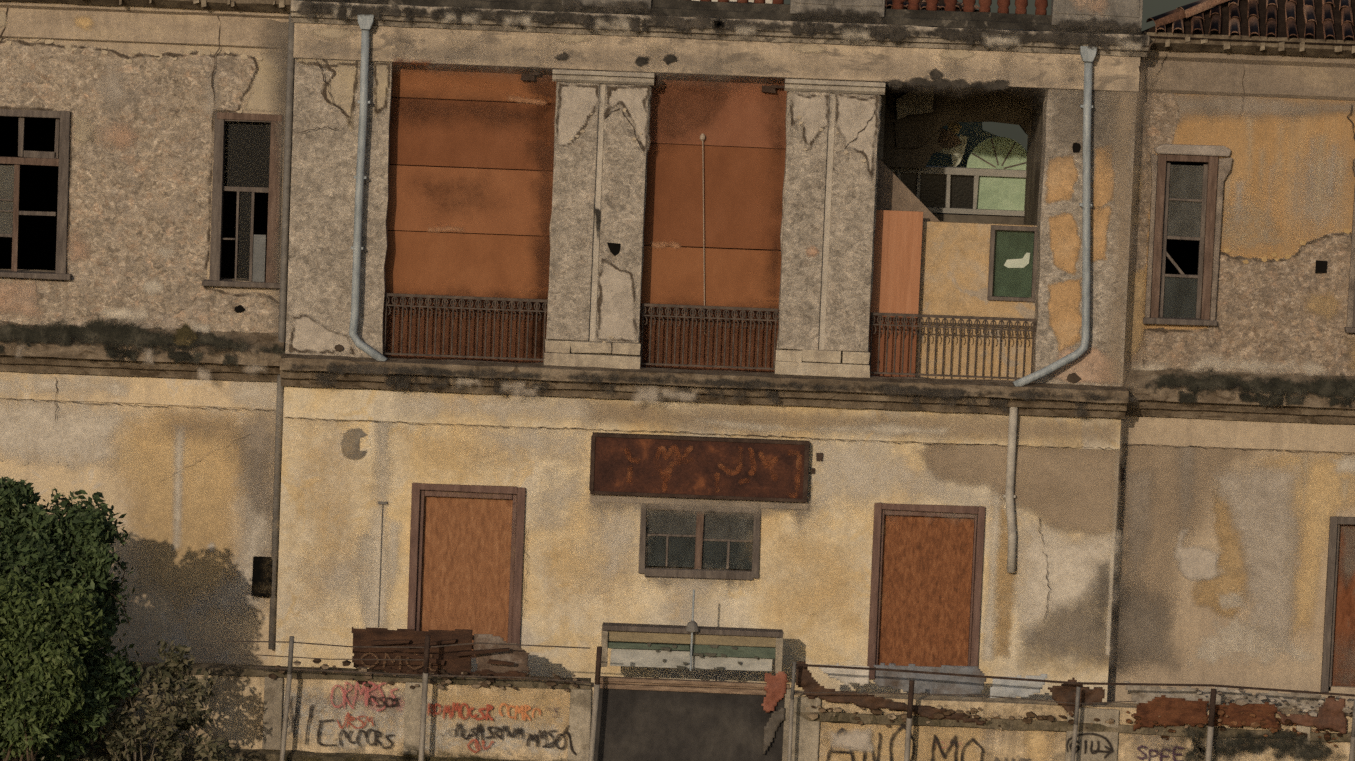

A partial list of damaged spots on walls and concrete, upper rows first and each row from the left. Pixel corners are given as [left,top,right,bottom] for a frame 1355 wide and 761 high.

spalling [0,11,358,354]
crack [208,16,221,111]
flaking render [555,83,650,151]
flaking render [790,69,1009,190]
spalling [1123,59,1355,376]
damp [1194,358,1282,371]
peeling [0,400,125,467]
damp [173,425,200,549]
damp [196,414,276,612]
damp [569,303,1250,667]
damp [1197,593,1309,663]
corrosion [1133,695,1347,734]